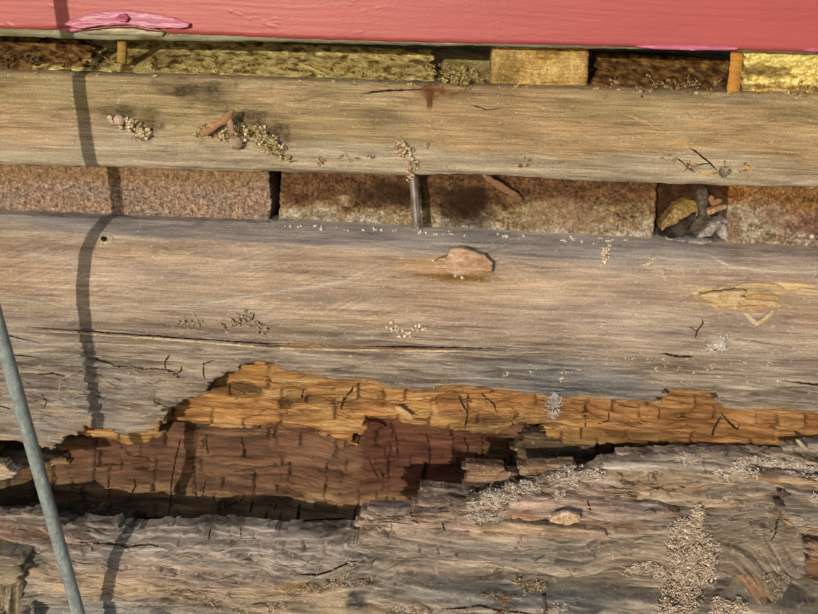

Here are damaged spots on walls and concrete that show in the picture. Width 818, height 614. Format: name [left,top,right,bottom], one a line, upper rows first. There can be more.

corrosion [422,85,444,106]
crack [9,327,540,408]
crack [167,437,181,516]
crack [368,431,399,480]
crack [423,434,431,480]
crack [224,499,277,537]
crack [296,504,419,524]
peeling [549,510,580,525]